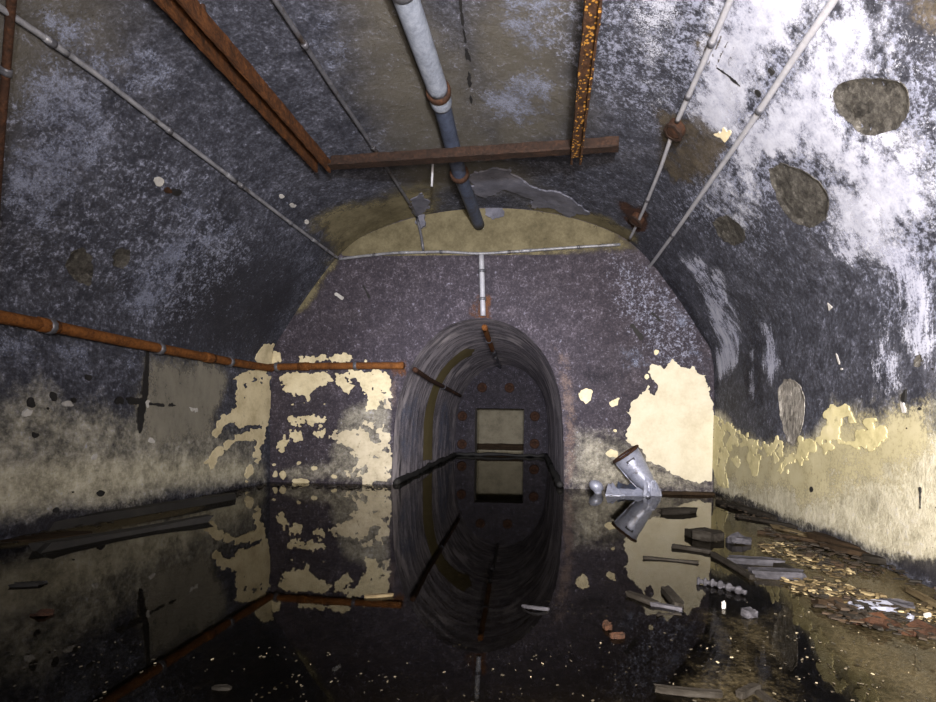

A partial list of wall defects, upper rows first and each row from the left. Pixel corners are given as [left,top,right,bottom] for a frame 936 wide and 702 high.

damp [613,0,689,65]
spalling [830,77,910,137]
damp [639,0,936,380]
spalling [768,162,829,228]
damp [749,322,781,400]
damp [871,332,901,392]
peeling [204,343,393,484]
peeling [578,388,593,404]
peeling [609,350,888,488]